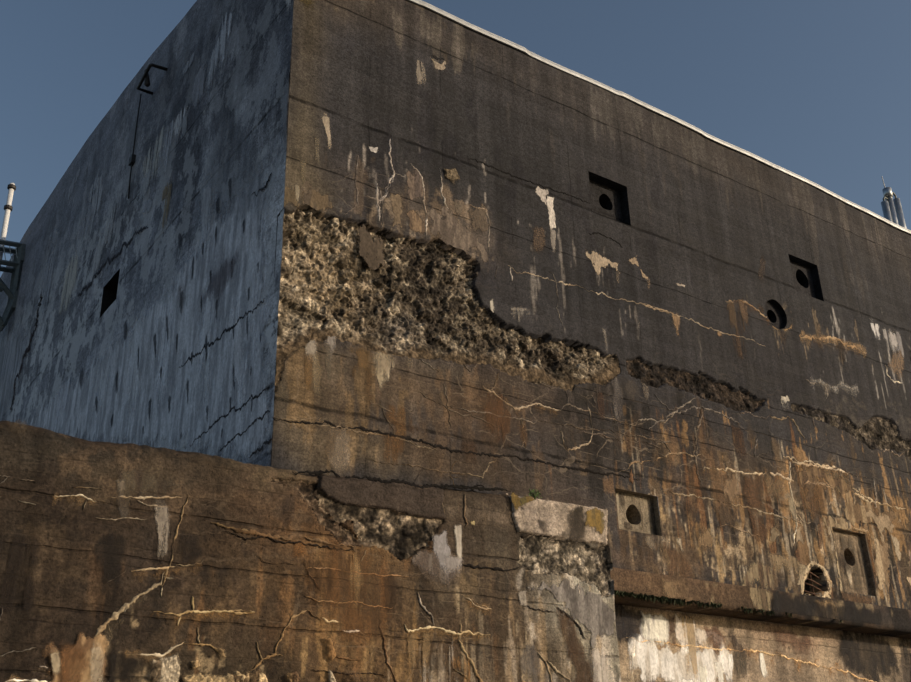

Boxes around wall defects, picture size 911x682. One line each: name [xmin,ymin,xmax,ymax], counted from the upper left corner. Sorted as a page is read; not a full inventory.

spalling [274,168,765,412]
crack [470,204,765,346]
damp [0,633,109,682]
crack [0,476,255,647]
damp [129,627,268,682]
spalling [270,475,443,561]
crack [190,360,906,544]
spalling [517,520,616,648]
damp [615,604,750,682]
corrosion [688,467,793,514]
corrosion [742,554,803,590]
peeling [792,461,901,608]